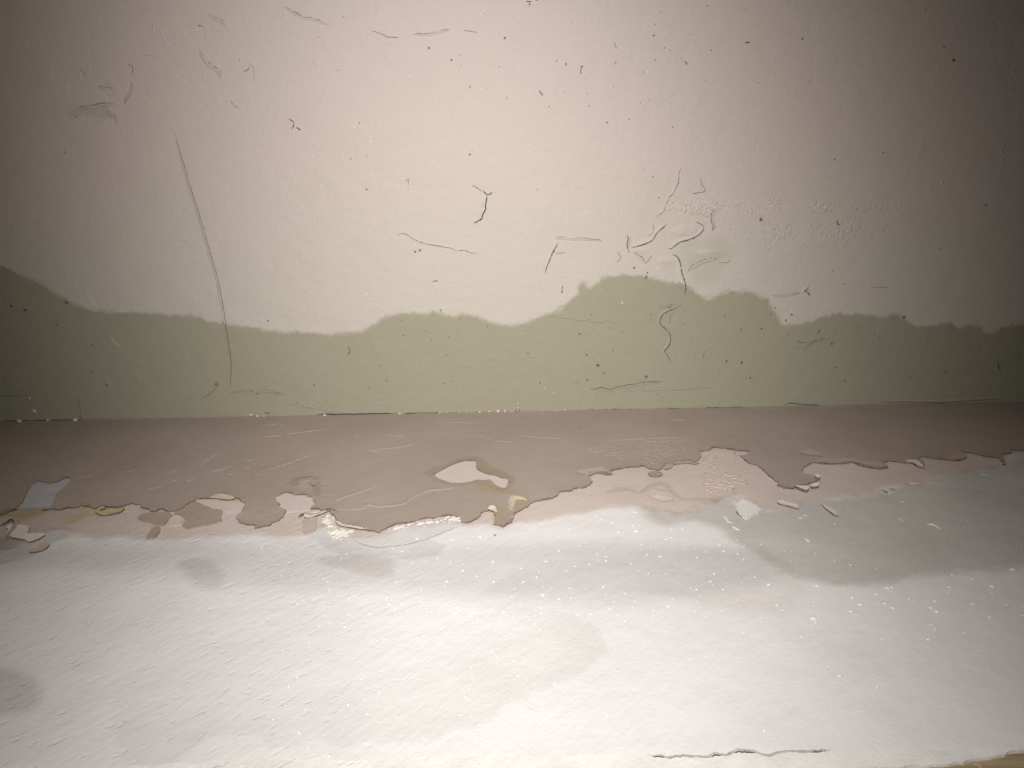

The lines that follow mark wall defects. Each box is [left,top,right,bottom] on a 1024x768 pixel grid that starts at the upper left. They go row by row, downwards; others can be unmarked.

crack [472,185,491,223]
crack [397,232,475,254]
crack [173,130,457,437]
crack [543,166,730,421]
peeling [17,478,70,511]
peeling [196,494,244,512]
peeling [275,493,367,531]
peeling [435,461,545,513]
damp [0,401,1024,541]
peeling [795,449,887,493]
peeling [7,524,50,553]
crack [646,748,831,759]